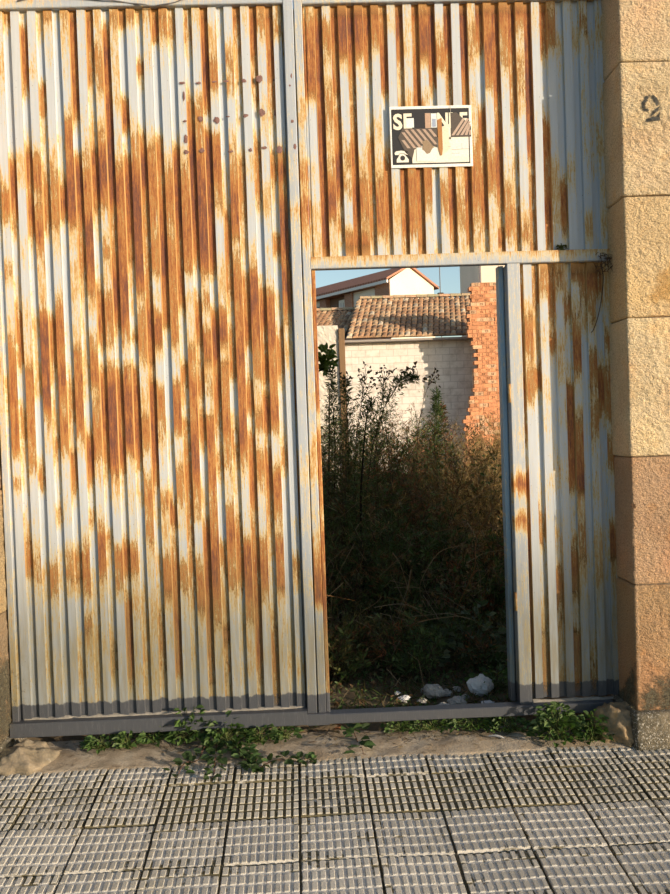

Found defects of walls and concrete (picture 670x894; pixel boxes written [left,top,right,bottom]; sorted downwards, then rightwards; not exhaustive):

corrosion [306,8,567,250]
corrosion [0,13,301,700]
corrosion [520,270,616,493]
corrosion [526,471,550,689]
corrosion [556,521,587,619]
corrosion [573,629,597,687]